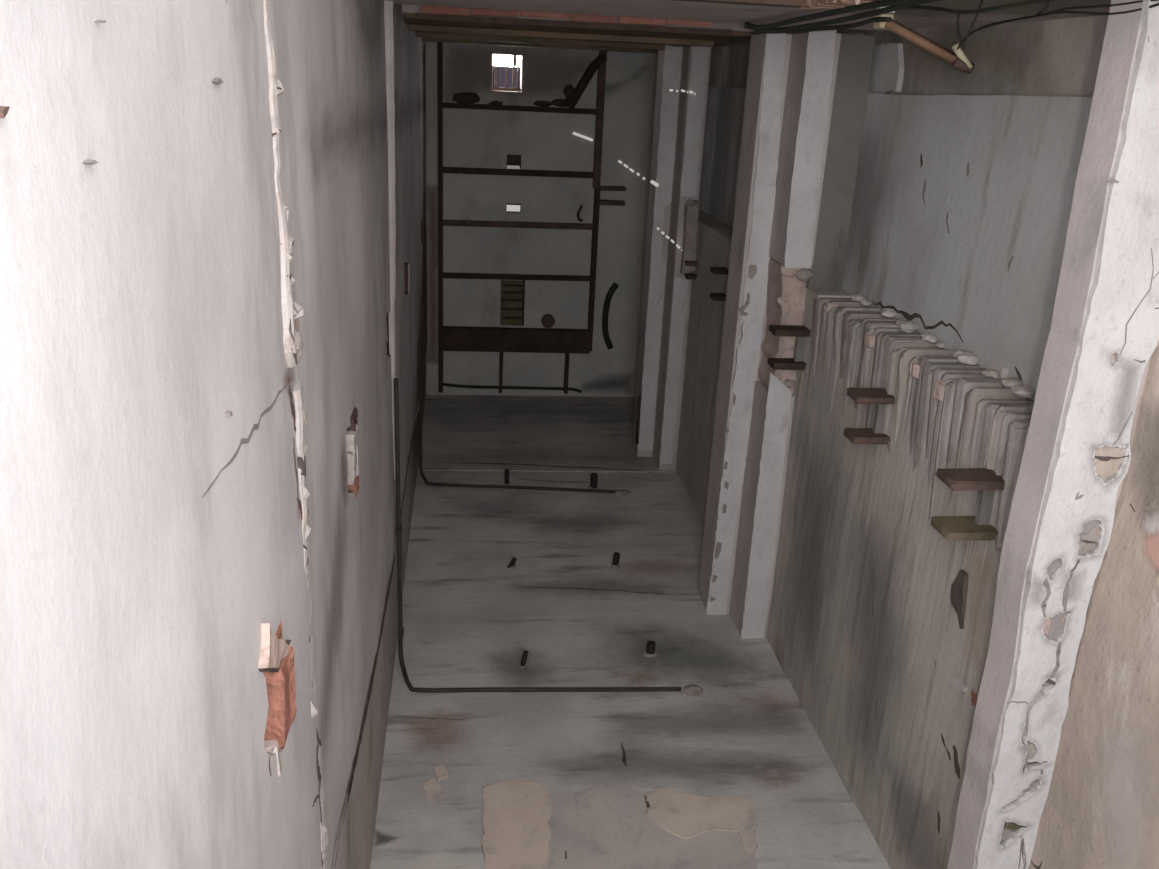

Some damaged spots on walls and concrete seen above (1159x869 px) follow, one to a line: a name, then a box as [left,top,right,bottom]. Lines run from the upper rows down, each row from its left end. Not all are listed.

spalling [263,0,304,368]
spalling [758,258,815,395]
crack [872,301,963,342]
crack [202,319,309,565]
spalling [1094,446,1129,482]
spalling [1078,520,1101,555]
spalling [293,380,329,869]
spalling [1010,739,1047,804]
spalling [1000,822,1027,844]